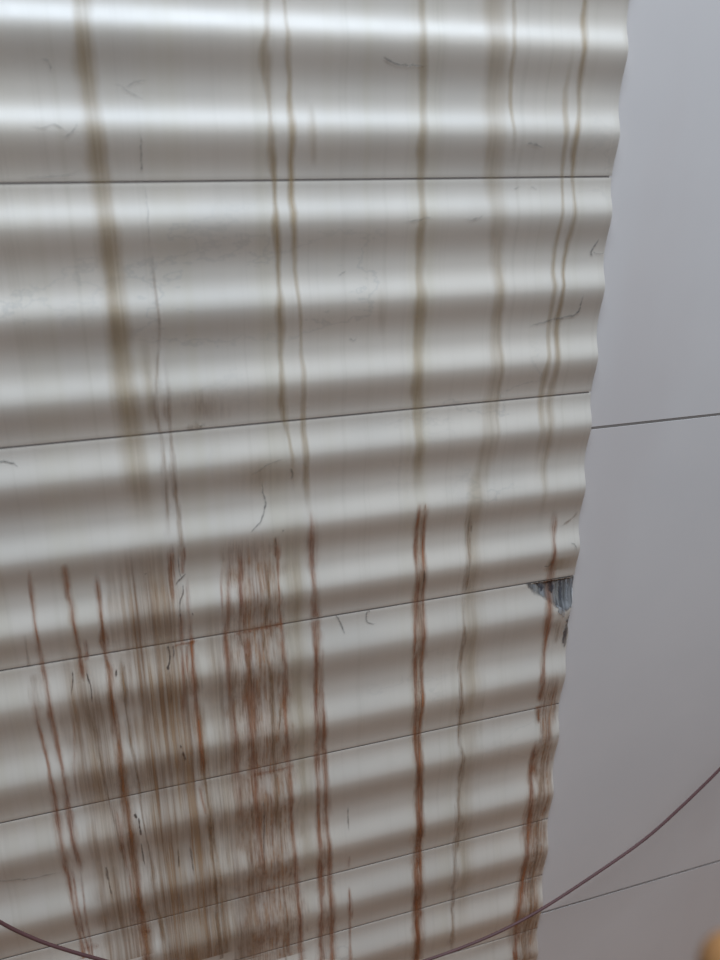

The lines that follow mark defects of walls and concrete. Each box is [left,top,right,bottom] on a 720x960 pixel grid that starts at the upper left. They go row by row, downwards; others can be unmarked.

corrosion [107,661,126,720]
corrosion [240,558,301,957]
corrosion [513,694,554,960]
spalling [527,576,574,643]